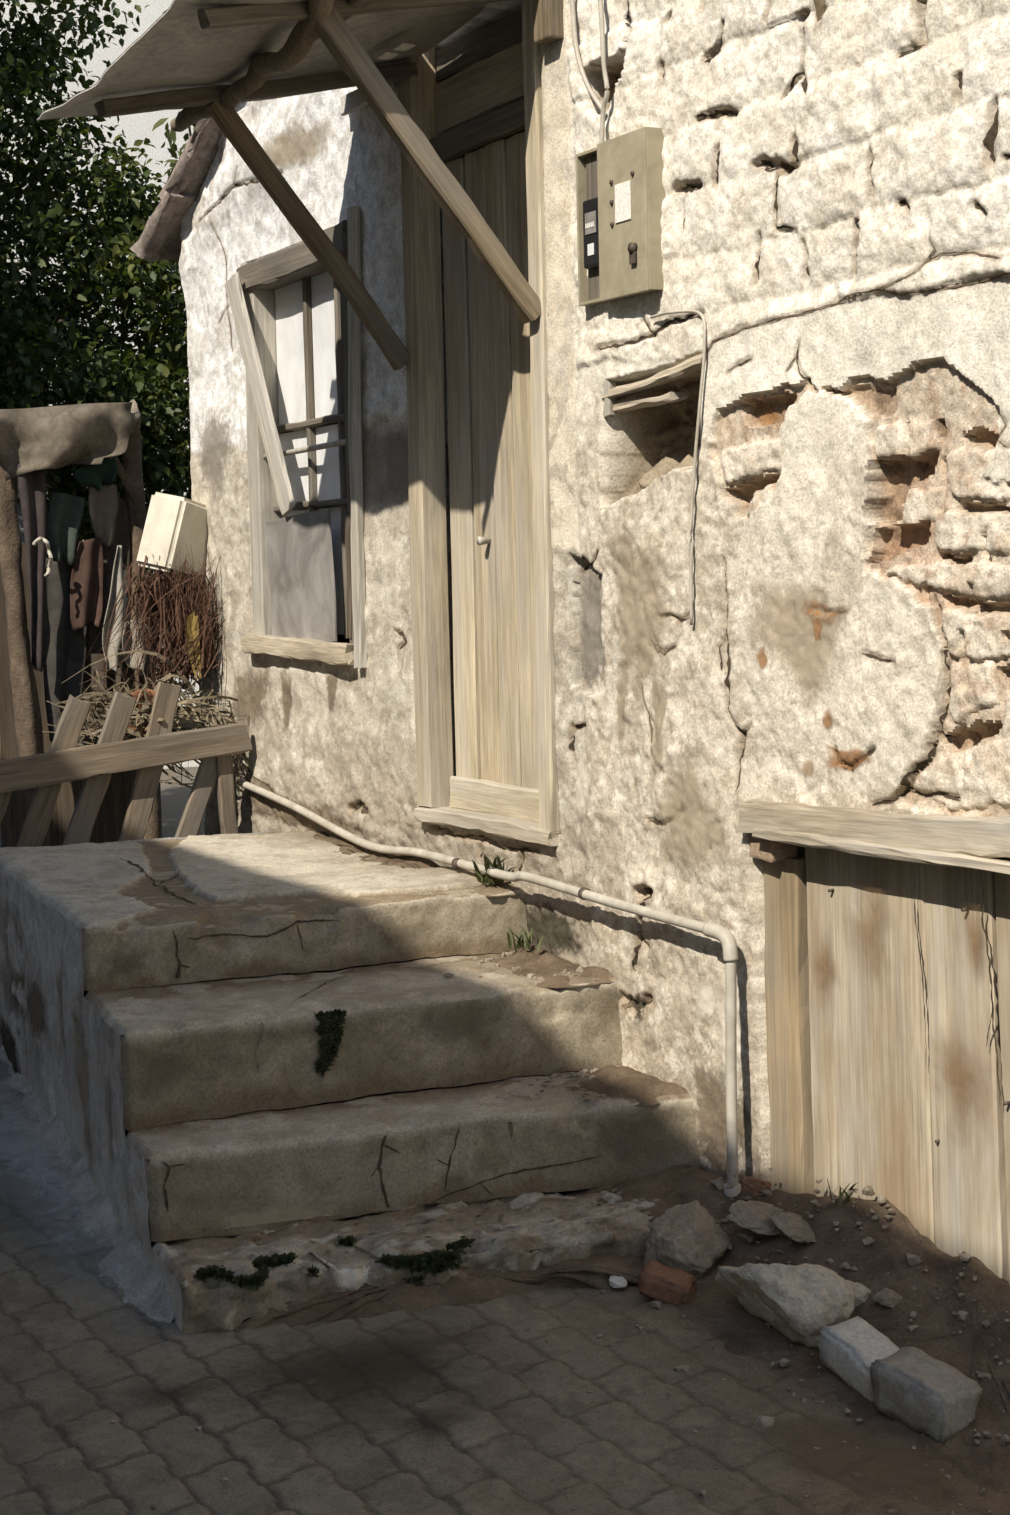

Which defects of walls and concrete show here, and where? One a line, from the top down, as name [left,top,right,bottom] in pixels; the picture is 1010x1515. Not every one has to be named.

peeling [580,584,605,675]
crack [719,571,750,791]
crack [837,749,875,771]
spalling [707,356,1010,817]
crack [862,653,894,662]
crack [873,598,960,805]
crack [119,857,340,978]
crack [371,1128,605,1214]